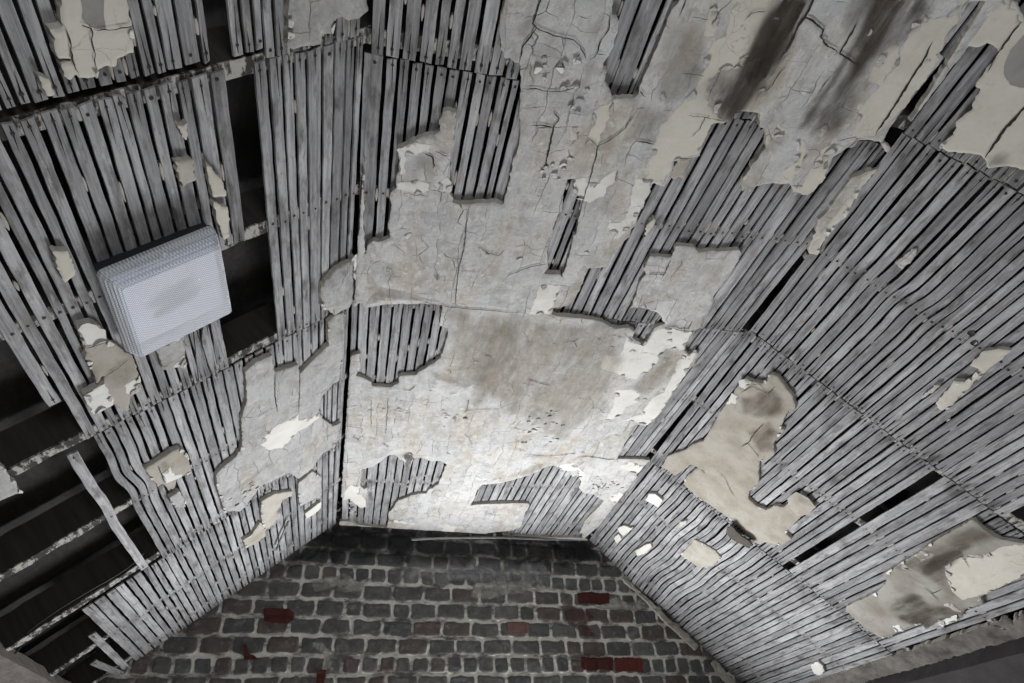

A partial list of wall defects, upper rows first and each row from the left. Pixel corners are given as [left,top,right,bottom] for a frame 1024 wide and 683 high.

crack [519,0,610,63]
leakage [721,0,798,120]
crack [764,0,858,95]
leakage [845,0,924,95]
crack [523,84,579,169]
crack [575,91,652,230]
spalling [0,0,520,660]
spalling [473,0,1024,683]